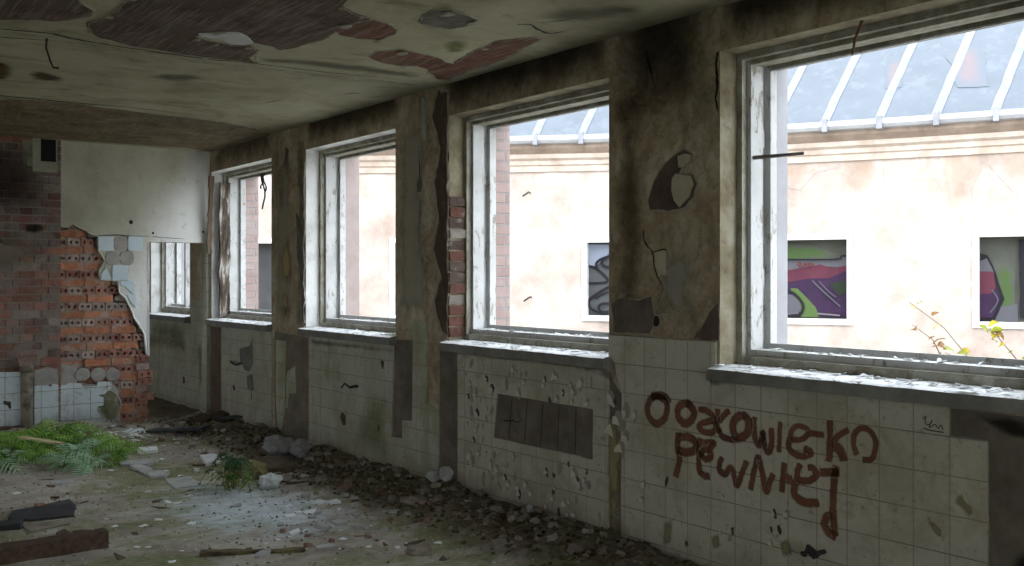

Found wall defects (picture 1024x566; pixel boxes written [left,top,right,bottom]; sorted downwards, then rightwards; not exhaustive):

crack [713,52,721,115]
spalling [647,148,698,212]
spalling [0,0,661,533]
crack [643,230,667,304]